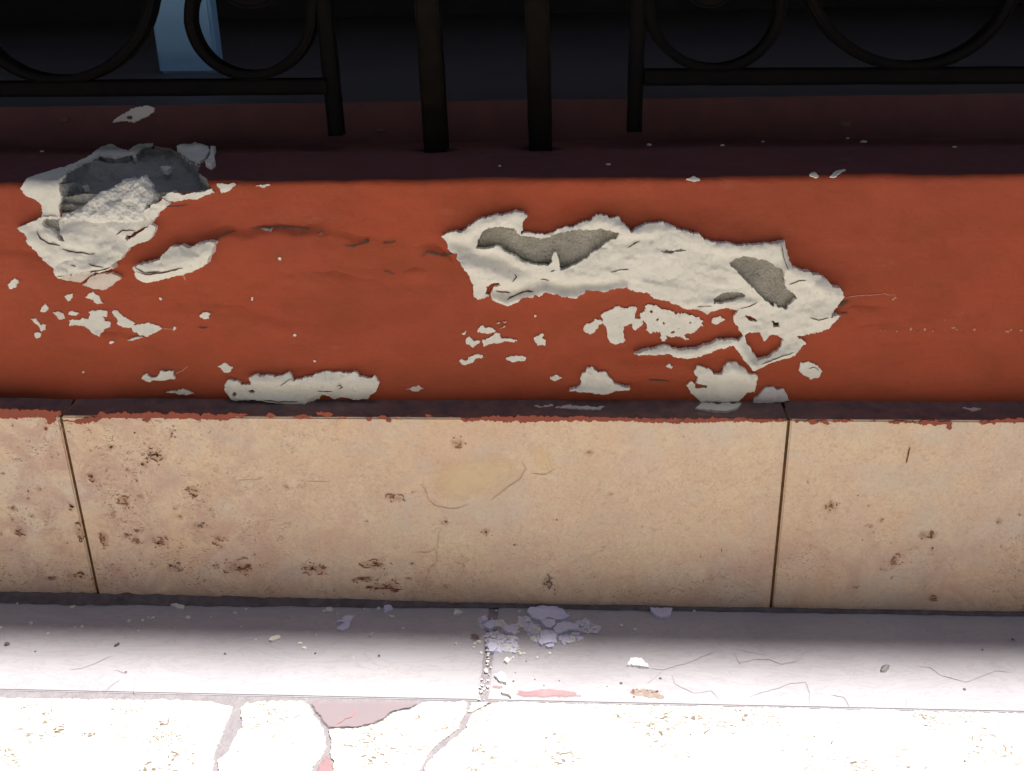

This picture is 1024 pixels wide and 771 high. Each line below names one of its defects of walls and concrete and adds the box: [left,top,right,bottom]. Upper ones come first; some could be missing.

flaking render [17,142,236,344]
flaking render [441,209,844,403]
peeling [218,360,380,405]
peeling [535,366,630,410]
crack [648,626,849,705]